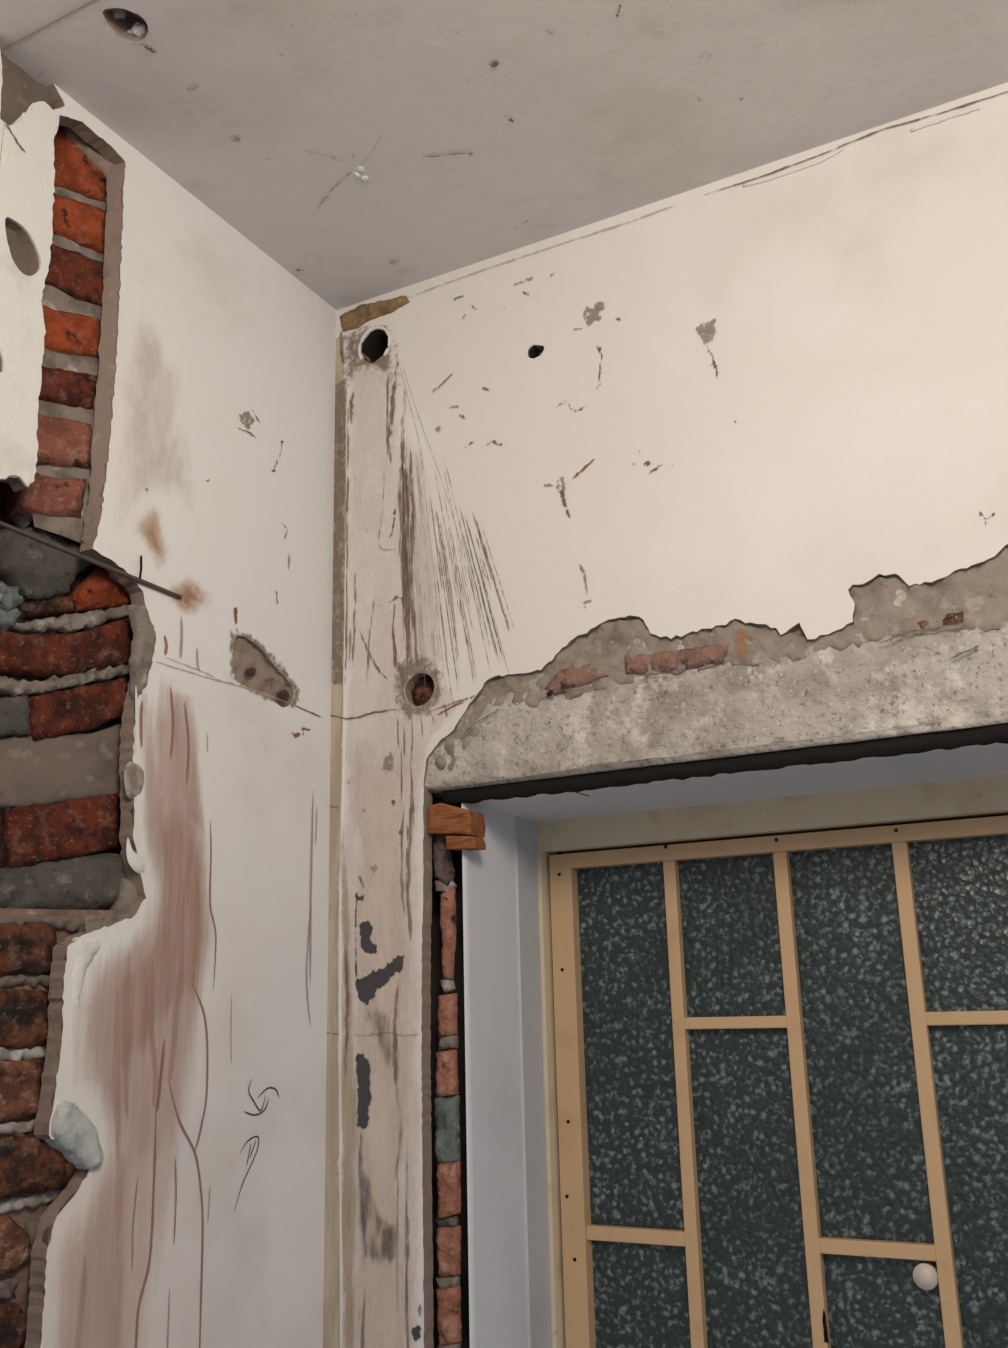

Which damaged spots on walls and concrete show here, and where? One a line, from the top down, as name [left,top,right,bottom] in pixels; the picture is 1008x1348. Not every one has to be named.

flaking render [0,48,56,123]
peeling [574,301,621,330]
peeling [696,318,718,377]
spalling [0,126,156,1348]
damp [166,687,190,847]
spalling [230,607,299,707]
flaking render [323,338,404,1348]
damp [397,371,514,800]
spalling [435,547,1008,771]
damp [63,821,217,1348]